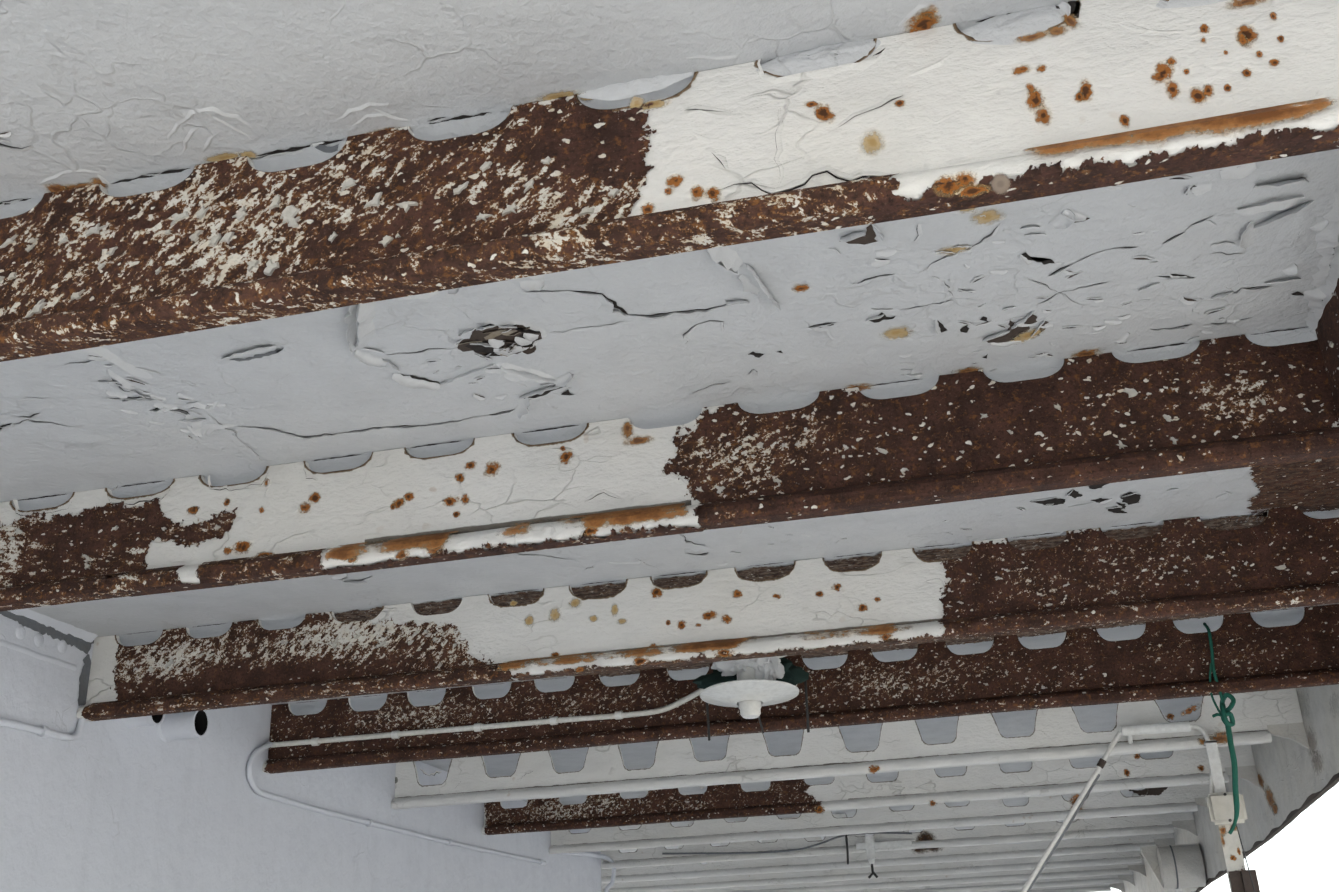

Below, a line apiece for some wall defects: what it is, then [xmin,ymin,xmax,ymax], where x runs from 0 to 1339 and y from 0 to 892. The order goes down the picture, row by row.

rust [1017,14,1078,42]
rust [1224,25,1280,66]
rust [0,57,1339,362]
peeling [1168,162,1315,264]
crack [525,290,749,344]
peeling [932,246,1187,380]
peeling [344,302,576,419]
crack [689,369,757,395]
crack [0,397,71,431]
rust [0,278,1339,774]
peeling [1016,483,1141,513]
rust [484,779,825,835]